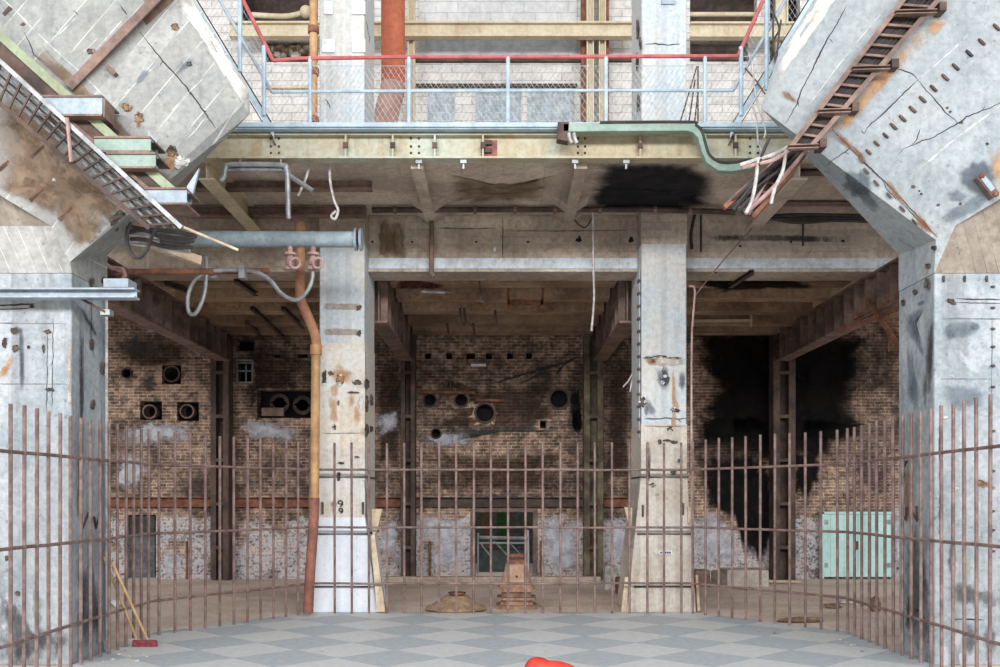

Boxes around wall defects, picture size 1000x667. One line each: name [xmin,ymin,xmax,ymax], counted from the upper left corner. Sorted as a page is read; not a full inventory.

crack [120,5,219,133]
crack [785,7,846,124]
rust [844,71,893,125]
spalling [166,145,190,170]
crack [828,69,999,237]
damp [456,176,543,202]
damp [595,188,703,208]
rust [331,368,347,418]
spalling [322,369,374,412]
peeling [643,355,682,385]
damp [800,343,862,439]
damp [748,468,769,556]